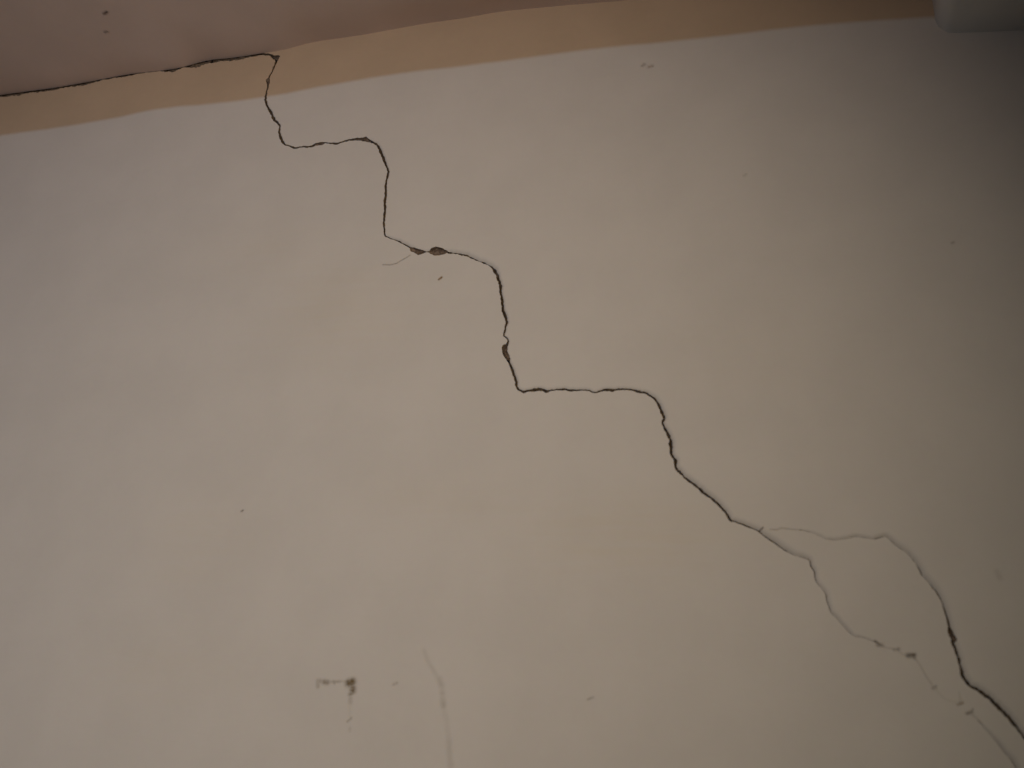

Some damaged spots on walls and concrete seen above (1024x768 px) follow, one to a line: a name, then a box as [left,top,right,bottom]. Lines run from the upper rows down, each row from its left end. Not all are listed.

crack [0,53,874,642]
crack [841,536,1024,768]